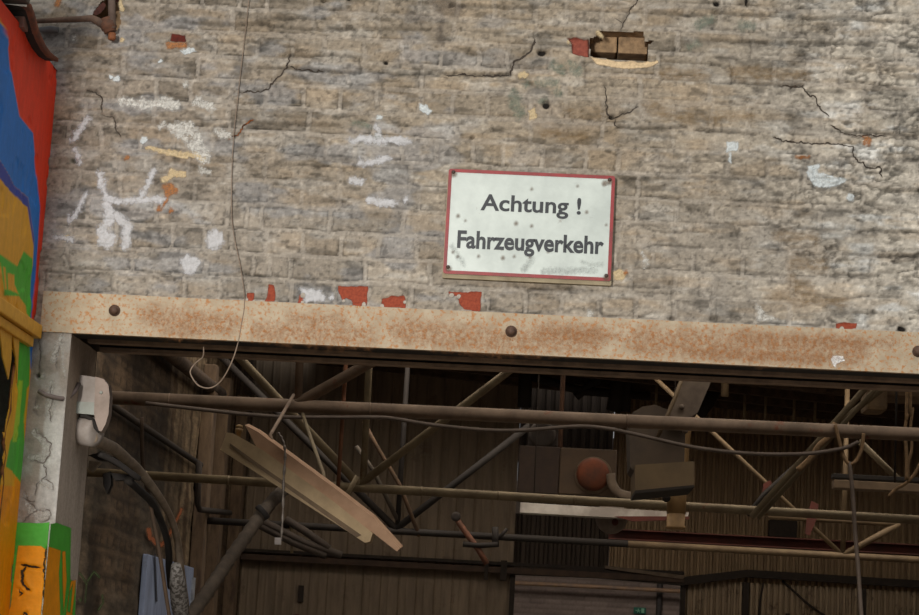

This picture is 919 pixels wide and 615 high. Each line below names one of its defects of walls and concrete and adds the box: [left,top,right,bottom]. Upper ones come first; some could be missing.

crack [240,55,323,93]
crack [445,39,536,78]
spalling [567,31,658,69]
crack [87,90,121,137]
crack [604,87,638,127]
crack [773,85,883,178]
spalling [338,286,368,306]
spalling [449,291,482,311]